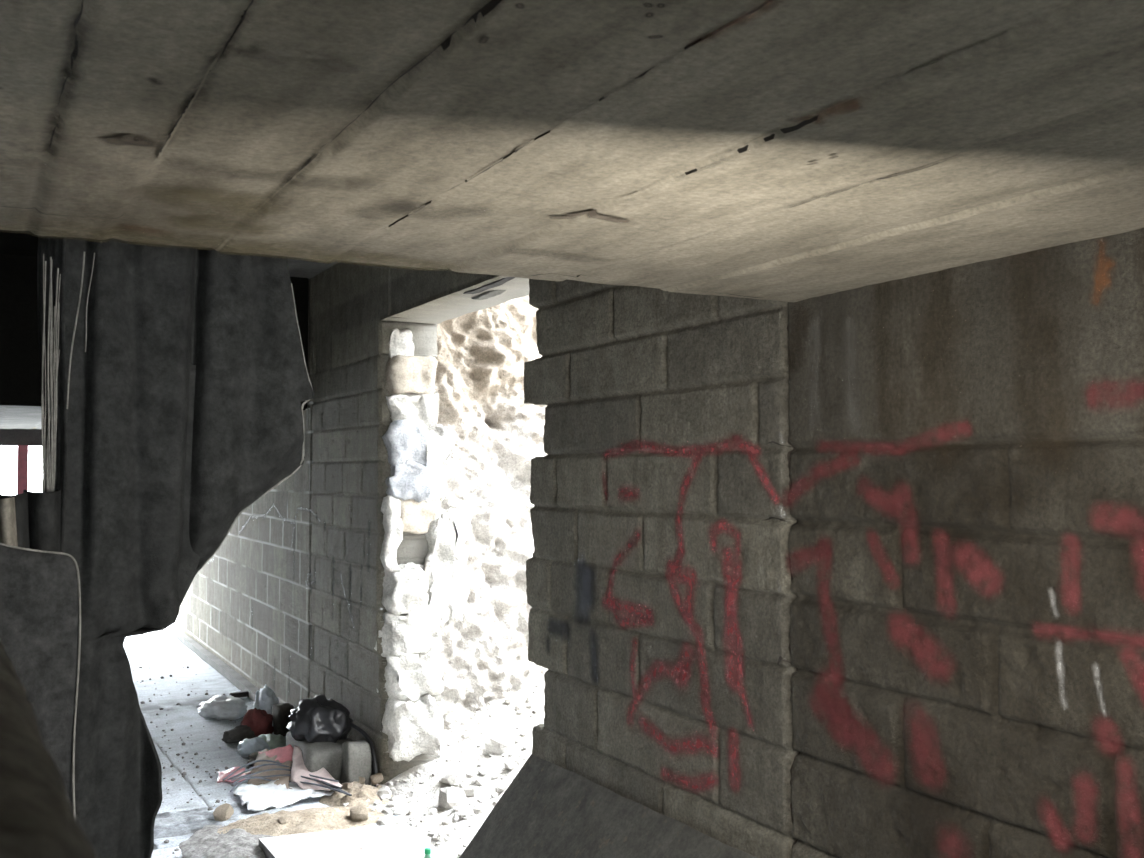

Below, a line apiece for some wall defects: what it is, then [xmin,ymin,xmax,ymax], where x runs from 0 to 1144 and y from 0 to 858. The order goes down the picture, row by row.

crack [737,117,818,153]
spalling [374,328,470,762]